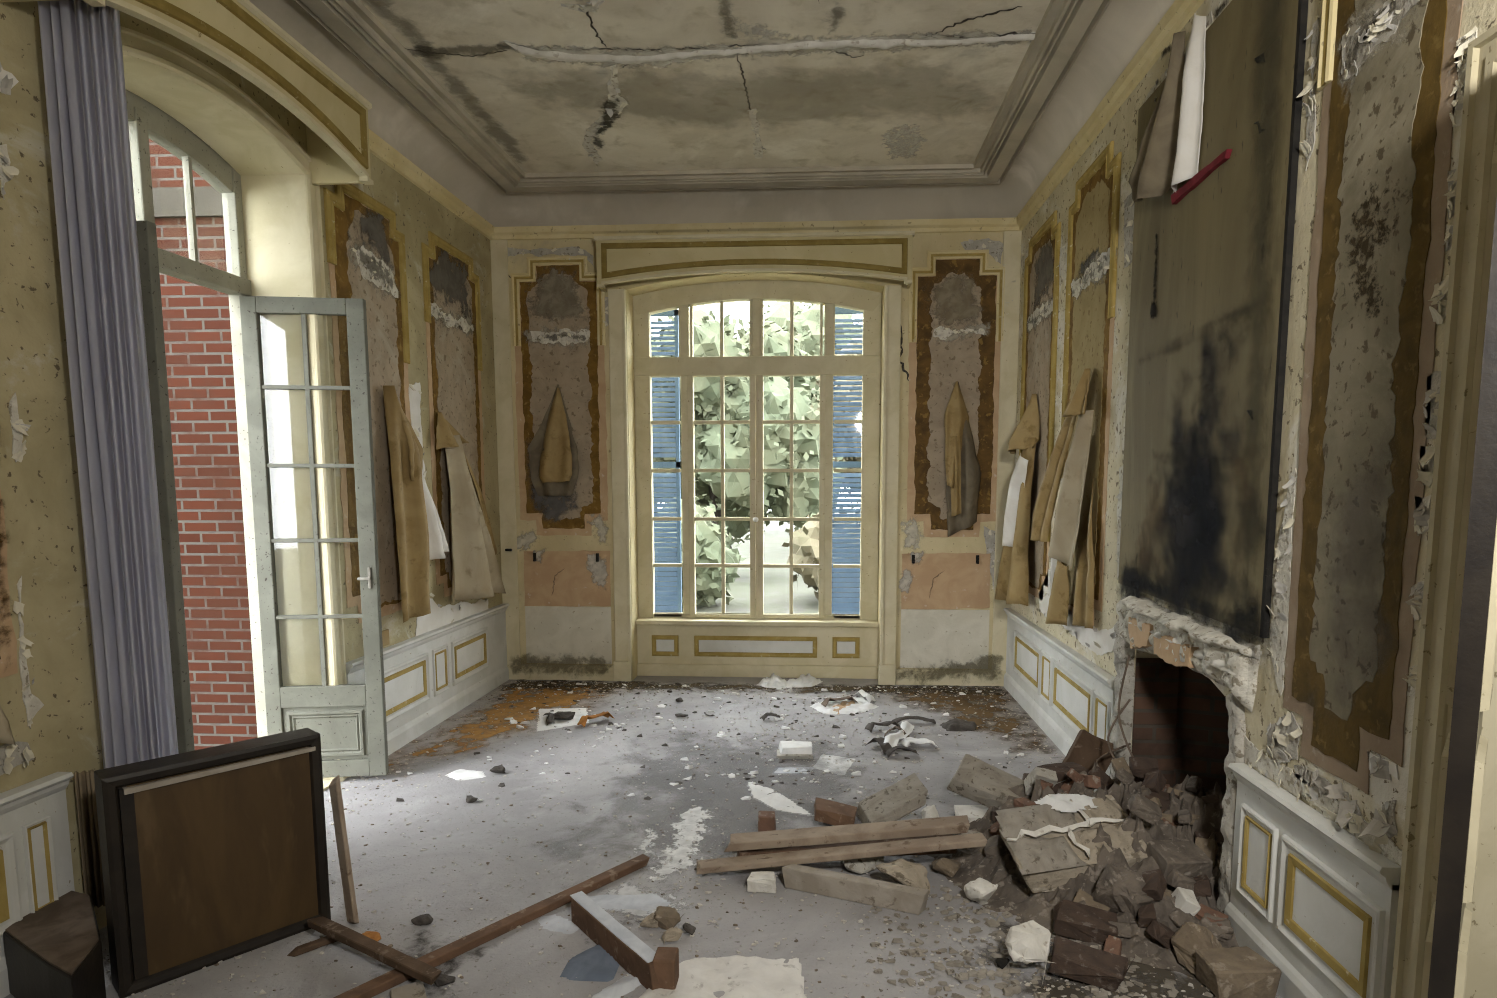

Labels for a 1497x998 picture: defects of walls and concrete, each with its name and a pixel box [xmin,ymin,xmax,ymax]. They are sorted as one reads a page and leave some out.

peeling [0,62,19,95]
flaking render [582,64,629,167]
crack [503,6,1036,141]
flaking render [1339,0,1420,87]
peeling [1449,26,1478,127]
flaking render [524,297,609,346]
flaking render [933,324,989,341]
mould [1344,182,1397,318]
peeling [1428,275,1449,325]
peeling [1413,371,1441,536]
peeling [0,576,44,776]
peeling [1244,468,1402,865]